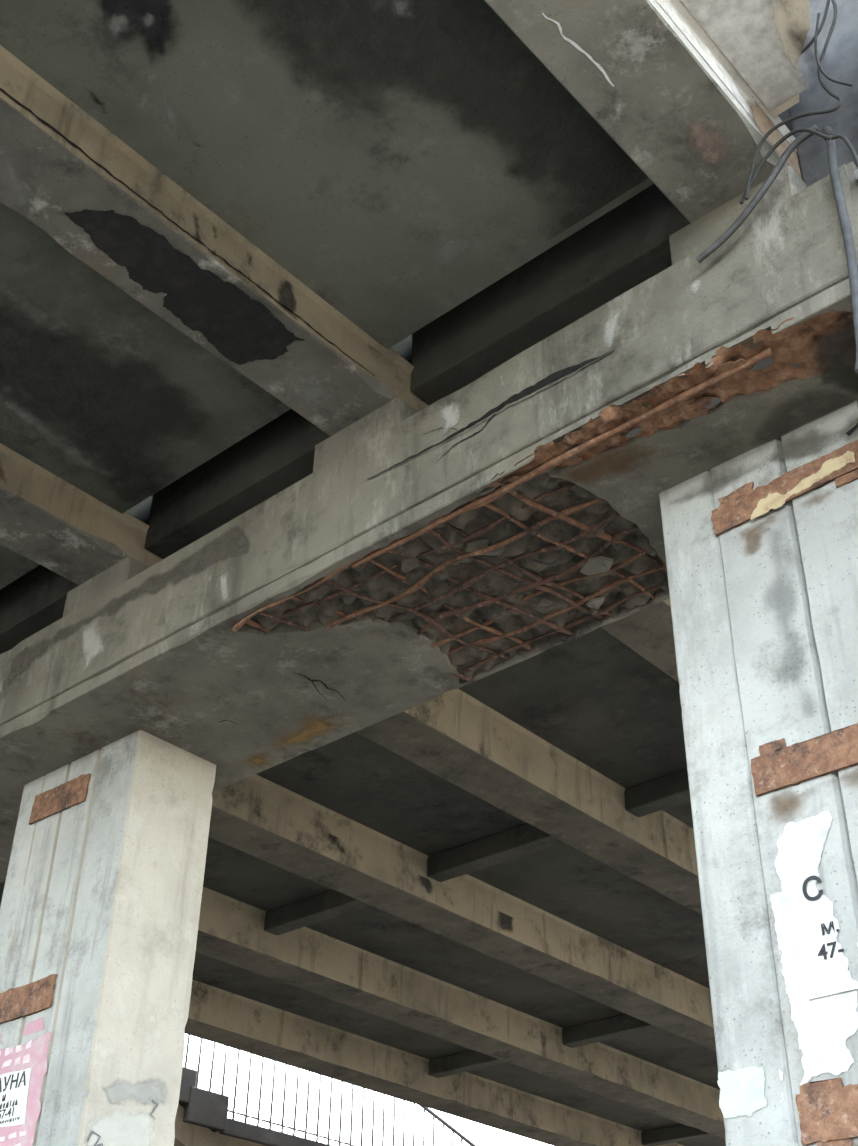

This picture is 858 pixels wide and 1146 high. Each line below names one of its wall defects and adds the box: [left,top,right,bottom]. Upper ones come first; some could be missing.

spalling [65,209,304,365]
crack [367,350,614,479]
corrosion [772,417,858,460]
spalling [232,311,855,683]
corrosion [690,474,741,497]
corrosion [746,526,759,551]
corrosion [774,795,798,814]